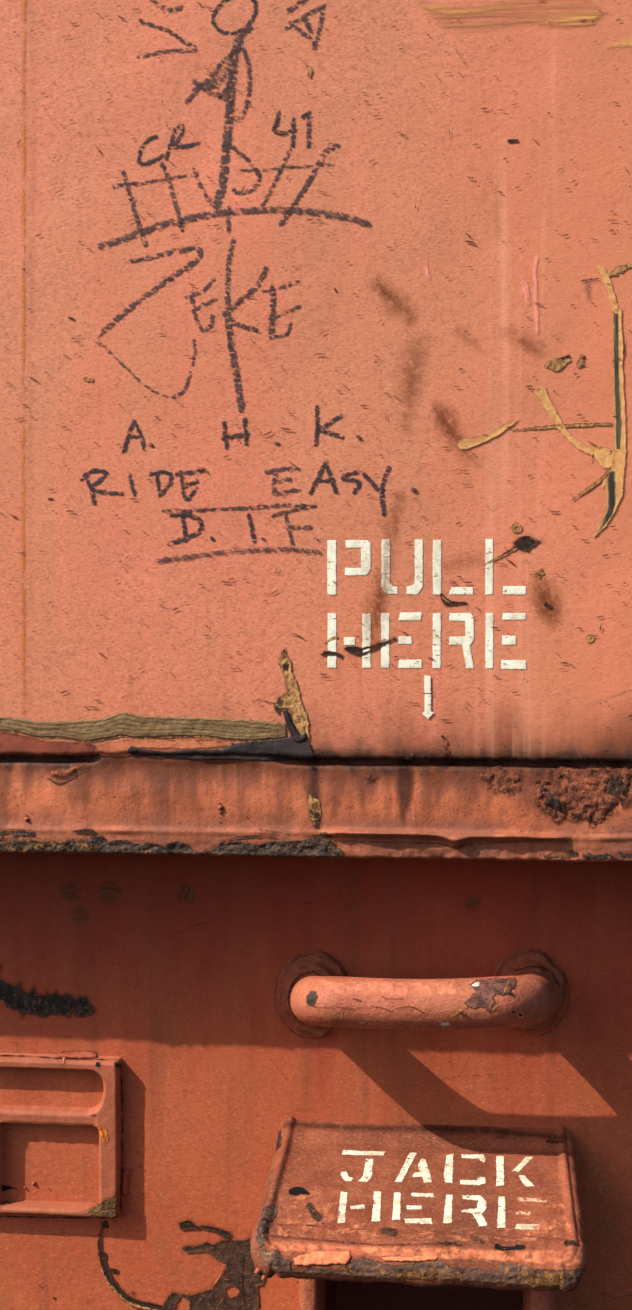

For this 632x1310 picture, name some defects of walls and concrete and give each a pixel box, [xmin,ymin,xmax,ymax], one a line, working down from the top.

peeling [544,354,585,372]
spalling [582,262,632,537]
corrosion [0,828,343,858]
peeling [0,966,94,1018]
peeling [441,977,525,1026]
peeling [269,1191,579,1266]
peeling [163,1219,265,1310]